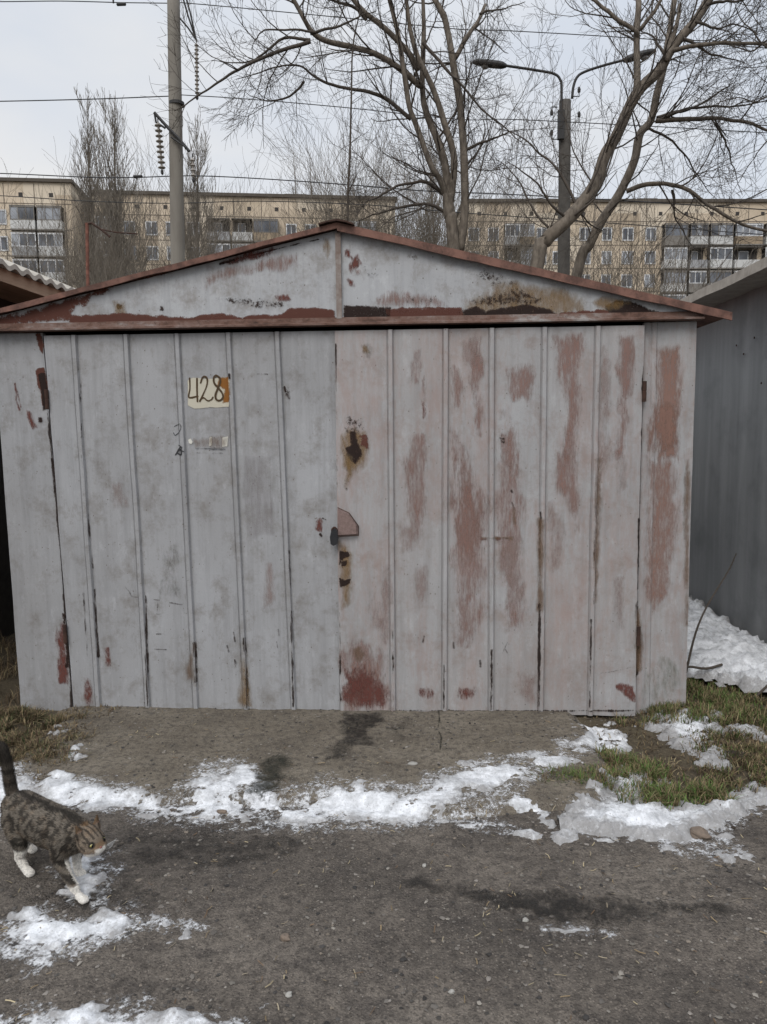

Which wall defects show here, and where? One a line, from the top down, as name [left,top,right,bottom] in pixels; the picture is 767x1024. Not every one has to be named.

rust [0,270,659,353]
rust [36,367,61,559]
rust [342,416,368,477]
rust [395,586,631,712]